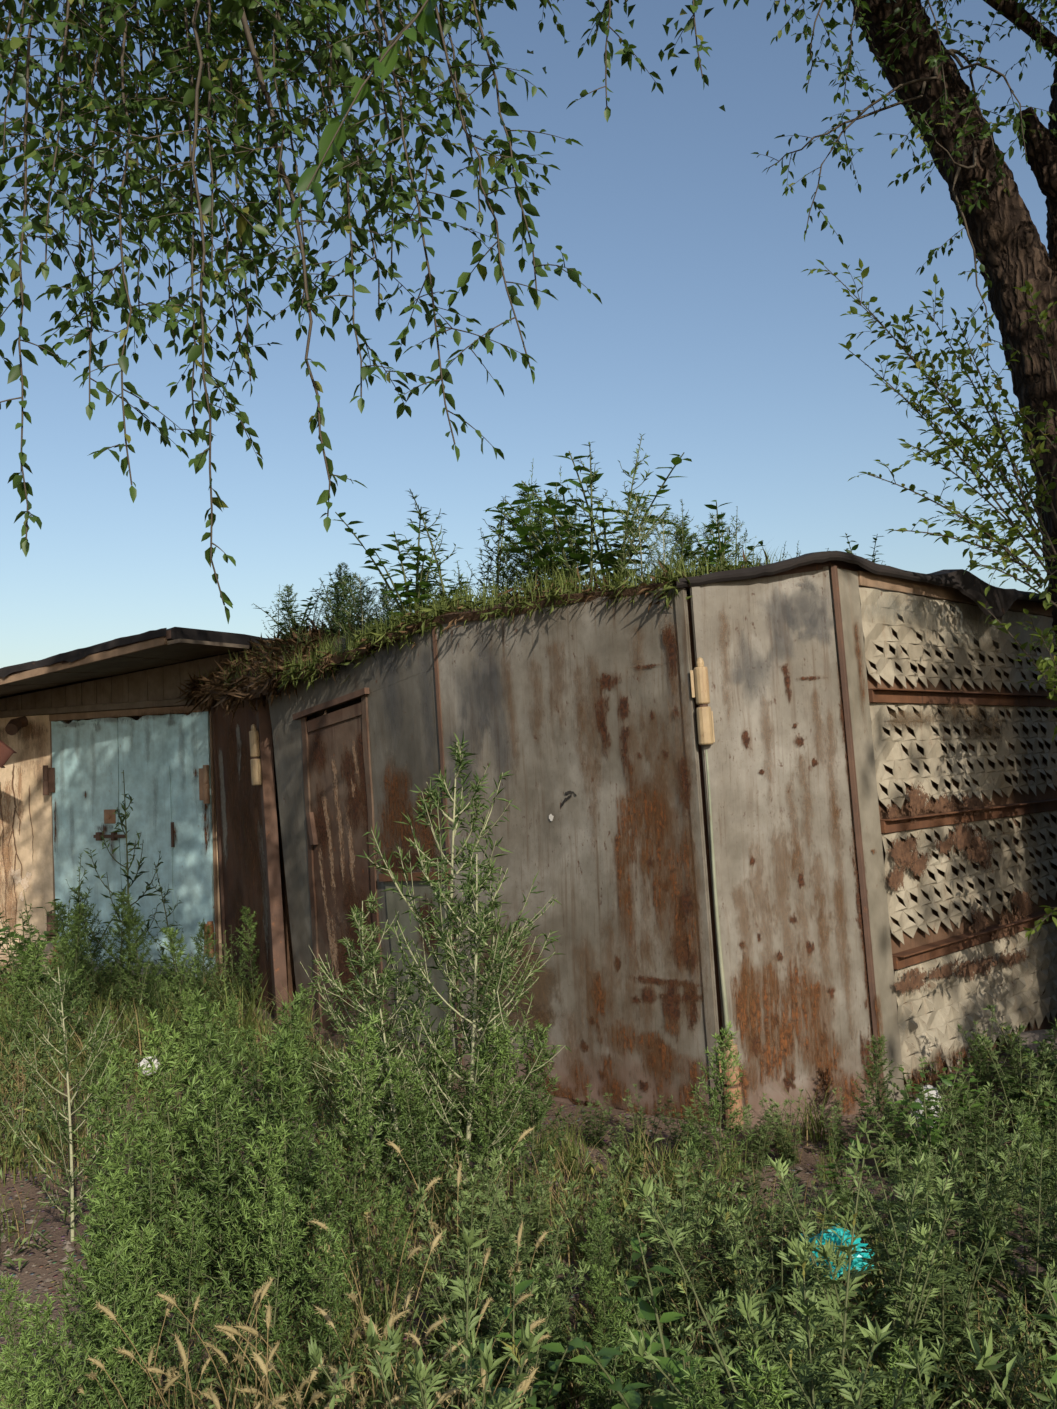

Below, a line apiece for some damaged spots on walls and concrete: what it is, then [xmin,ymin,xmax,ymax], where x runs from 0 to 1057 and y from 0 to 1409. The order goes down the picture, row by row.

rust [636,624,677,677]
rust [855,622,865,706]
rust [792,723,818,766]
rust [838,668,854,820]
rust [203,804,211,852]
rust [310,729,444,874]
rust [333,878,371,1009]
rust [418,894,440,958]
rust [528,672,726,1127]
rust [733,782,1001,1115]
rust [892,888,1034,996]